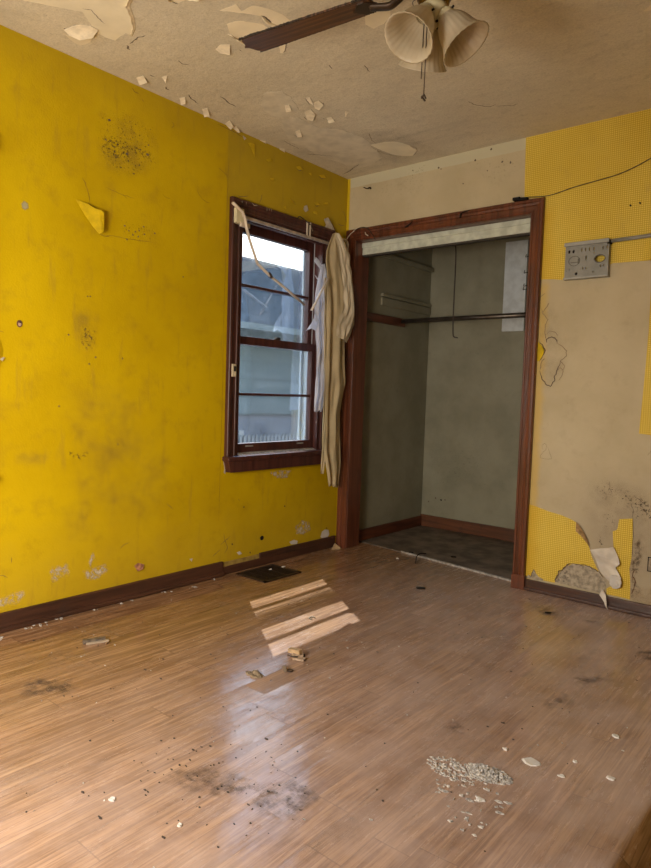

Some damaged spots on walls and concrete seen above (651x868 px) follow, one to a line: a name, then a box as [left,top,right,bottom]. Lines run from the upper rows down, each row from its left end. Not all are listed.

peeling [24,0,135,45]
peeling [216,4,290,55]
peeling [76,181,109,237]
spalling [555,563,606,593]